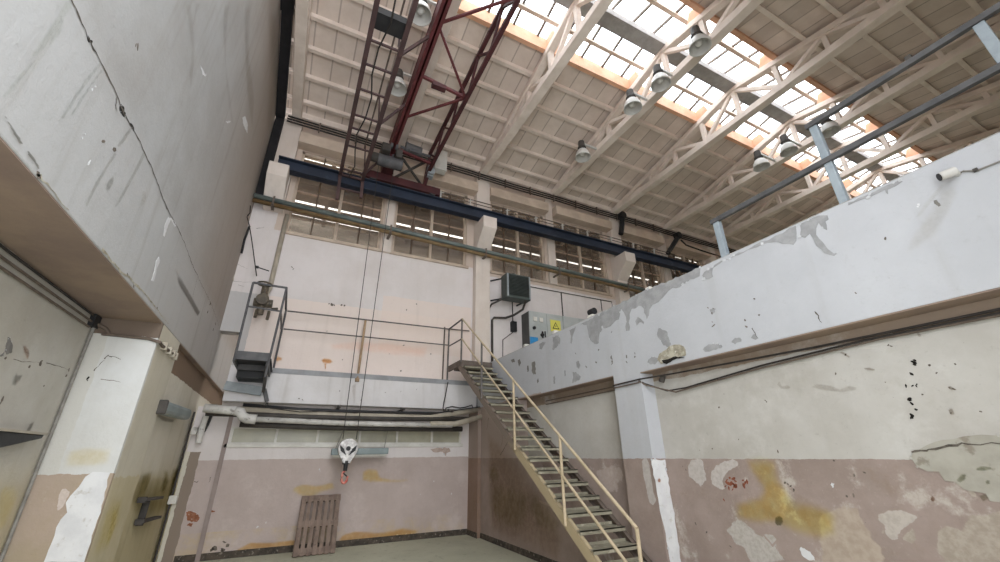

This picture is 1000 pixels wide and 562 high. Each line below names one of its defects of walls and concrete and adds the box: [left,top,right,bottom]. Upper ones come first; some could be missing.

crack [71,0,216,316]
peeling [539,215,839,384]
flaking render [905,359,938,419]
peeling [682,450,741,510]
peeling [800,493,921,562]
peeling [931,491,1000,562]